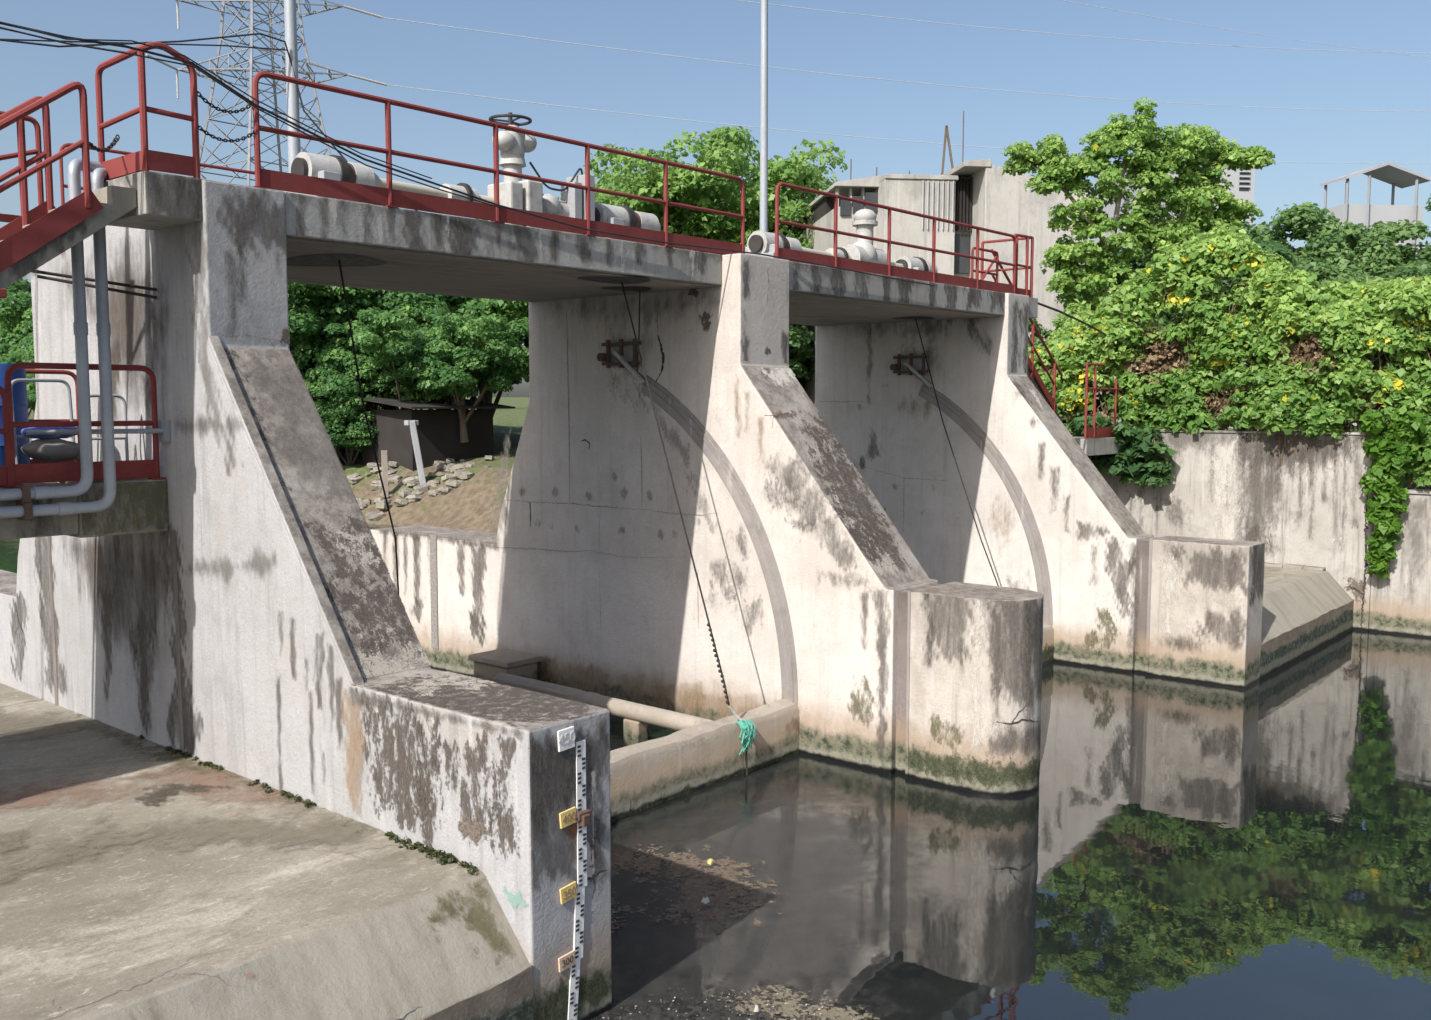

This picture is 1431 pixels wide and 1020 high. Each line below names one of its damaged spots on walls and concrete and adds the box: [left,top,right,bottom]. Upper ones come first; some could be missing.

water stain [321,197,338,238]
water stain [367,204,477,255]
water stain [495,223,558,263]
water stain [577,234,644,270]
water stain [438,438,522,645]
water stain [768,409,912,757]
water stain [1161,431,1370,649]
water stain [0,501,636,889]
water stain [925,593,1043,754]
crack [996,705,1038,725]